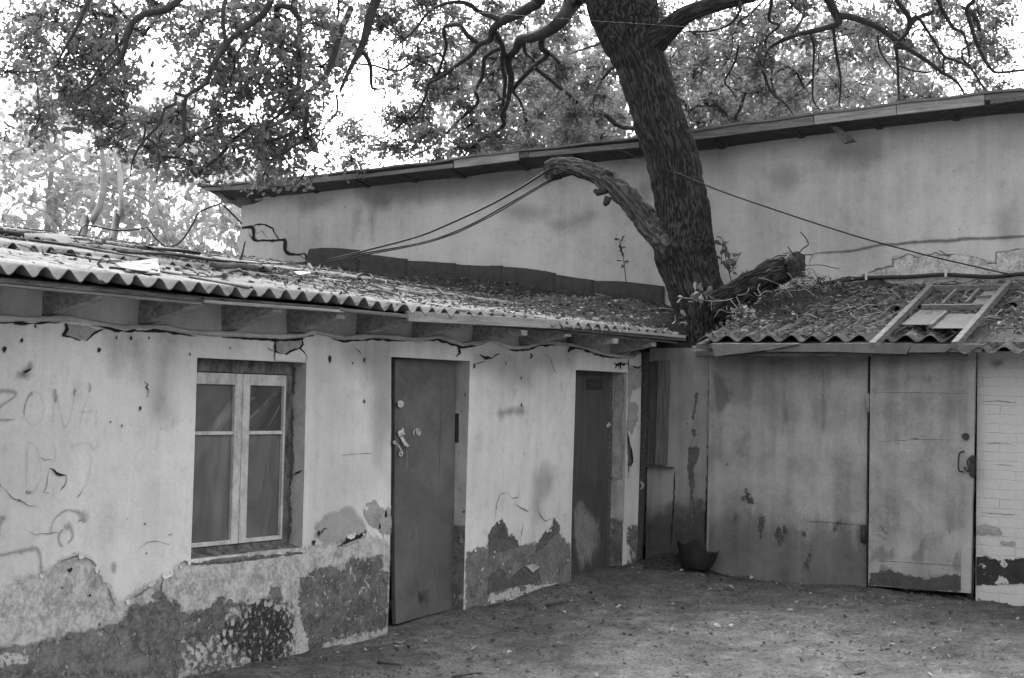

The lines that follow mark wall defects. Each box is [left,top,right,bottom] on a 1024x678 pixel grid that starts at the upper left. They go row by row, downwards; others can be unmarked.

flaking render [836,249,1024,287]
crack [0,321,193,341]
crack [223,335,399,363]
crack [426,339,642,374]
peeling [687,393,703,522]
flaking render [0,408,392,678]
peeling [465,518,572,609]
rust [869,569,961,592]
spalling [976,525,1024,586]